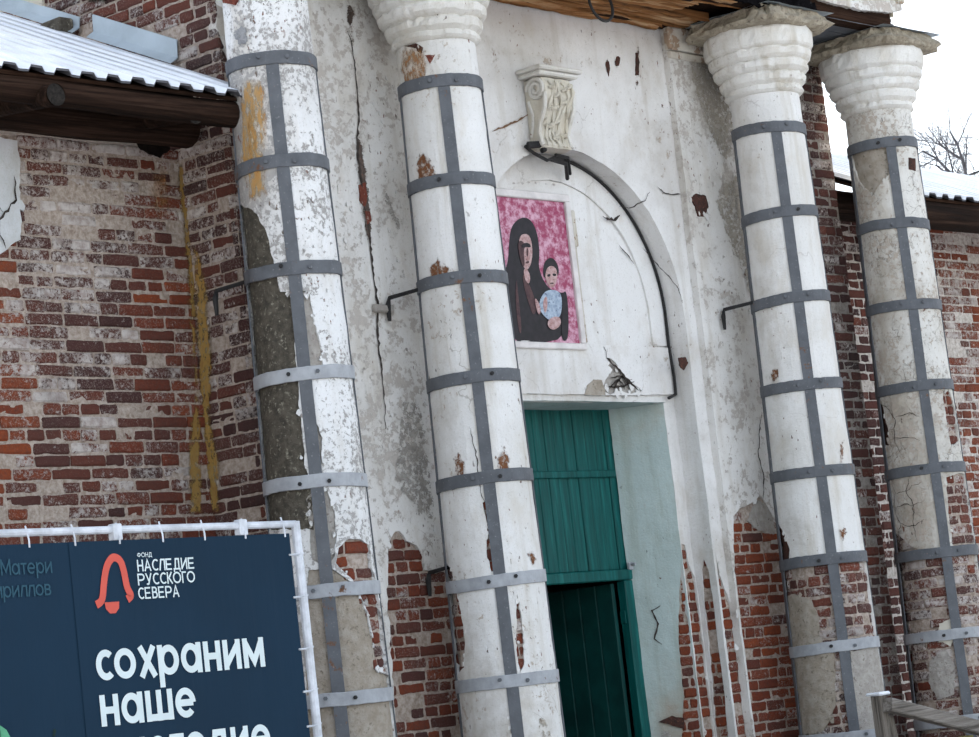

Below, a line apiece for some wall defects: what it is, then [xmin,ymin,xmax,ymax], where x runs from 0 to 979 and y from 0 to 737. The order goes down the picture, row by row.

rust [401,49,426,82]
crack [0,177,17,248]
rust [241,82,266,162]
rust [249,171,266,198]
crack [347,5,386,425]
rust [417,153,435,178]
flaking render [0,134,216,545]
flaking render [659,62,979,737]
crack [883,405,924,542]
peeling [268,488,320,586]
flaking render [335,527,466,737]
crack [651,606,661,644]